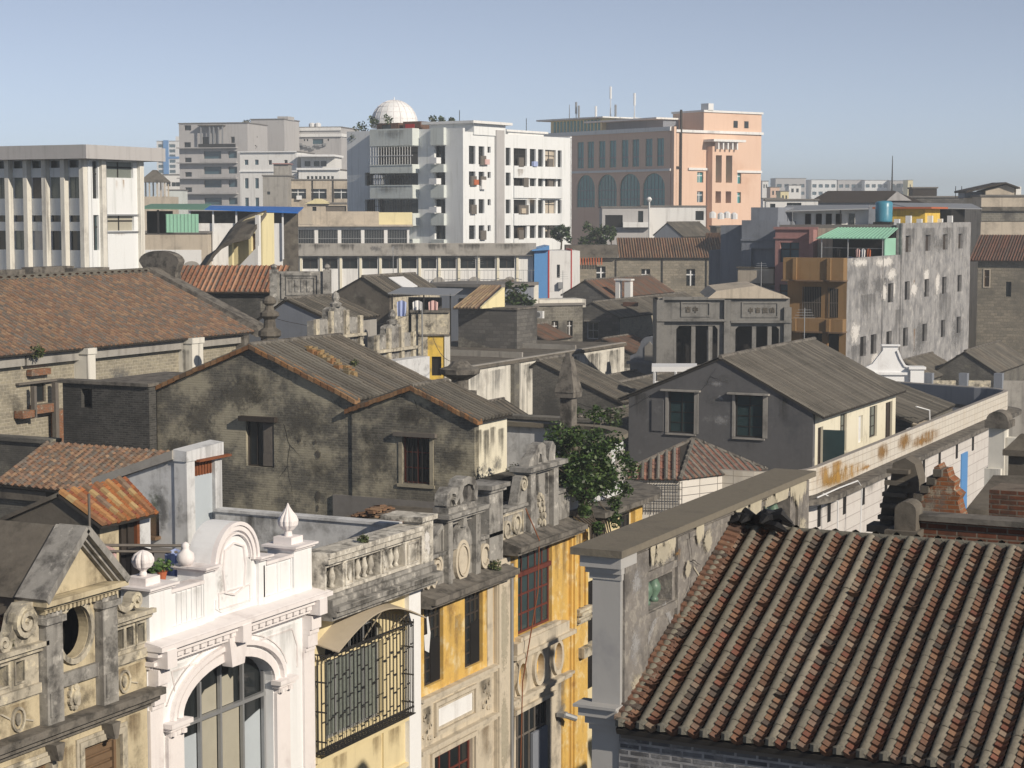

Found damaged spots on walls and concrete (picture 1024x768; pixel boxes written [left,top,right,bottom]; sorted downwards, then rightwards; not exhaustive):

rust [900,431,934,448]
rust [823,461,869,485]
peeling [651,537,676,565]
peeling [696,524,712,552]